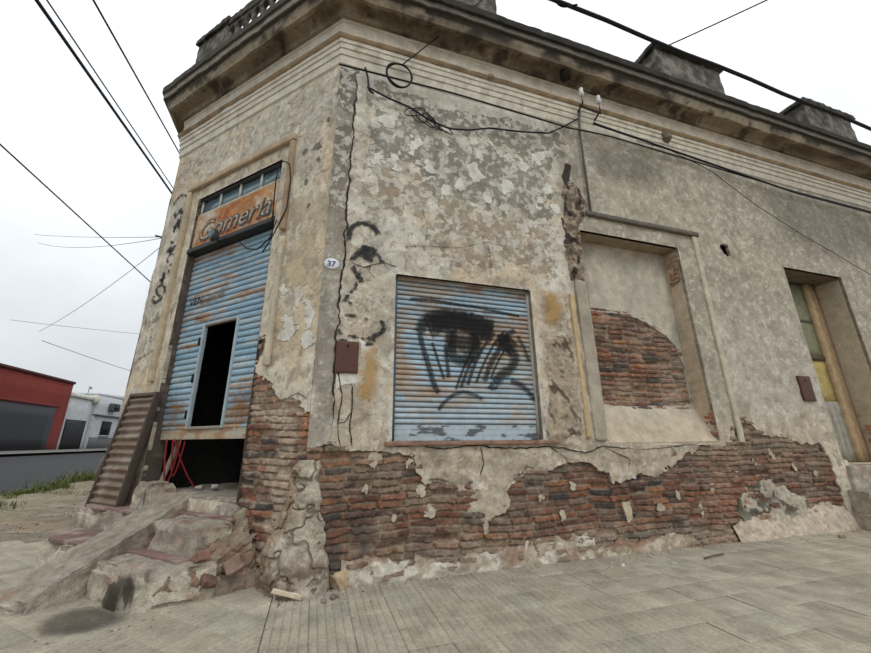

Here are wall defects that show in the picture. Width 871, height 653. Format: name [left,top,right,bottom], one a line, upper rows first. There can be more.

peeling [327,117,353,213]
peeling [337,67,587,286]
peeling [277,283,317,349]
flaking render [591,308,692,409]
flaking render [237,335,844,590]